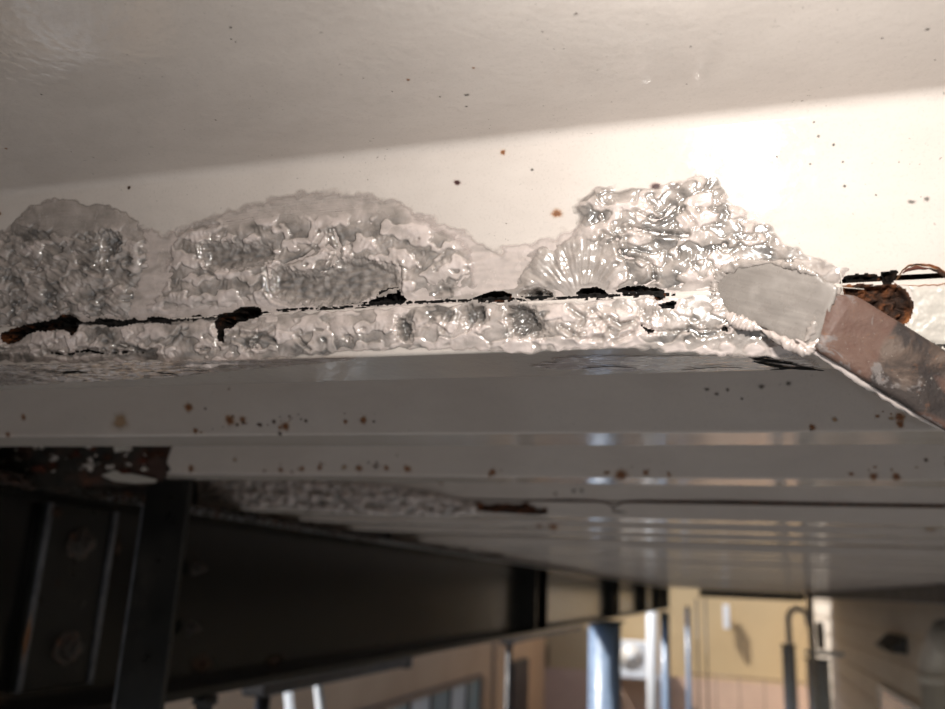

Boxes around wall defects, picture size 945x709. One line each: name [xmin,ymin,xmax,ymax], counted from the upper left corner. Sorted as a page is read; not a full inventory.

crack [276,287,676,312]
crack [0,314,218,374]
corrosion [226,414,307,436]
corrosion [0,432,172,489]